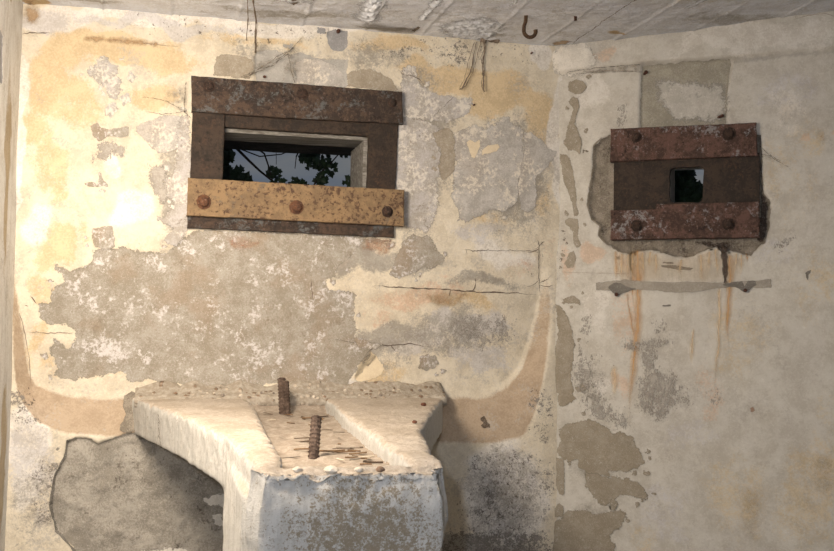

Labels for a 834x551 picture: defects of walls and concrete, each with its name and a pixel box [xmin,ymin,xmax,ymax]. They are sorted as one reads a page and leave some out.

damp [86,37,157,46]
peeling [38,27,771,422]
crack [378,242,553,296]
damp [11,390,41,425]
spalling [308,415,322,459]
peeling [552,291,657,551]
flaking render [49,391,224,551]